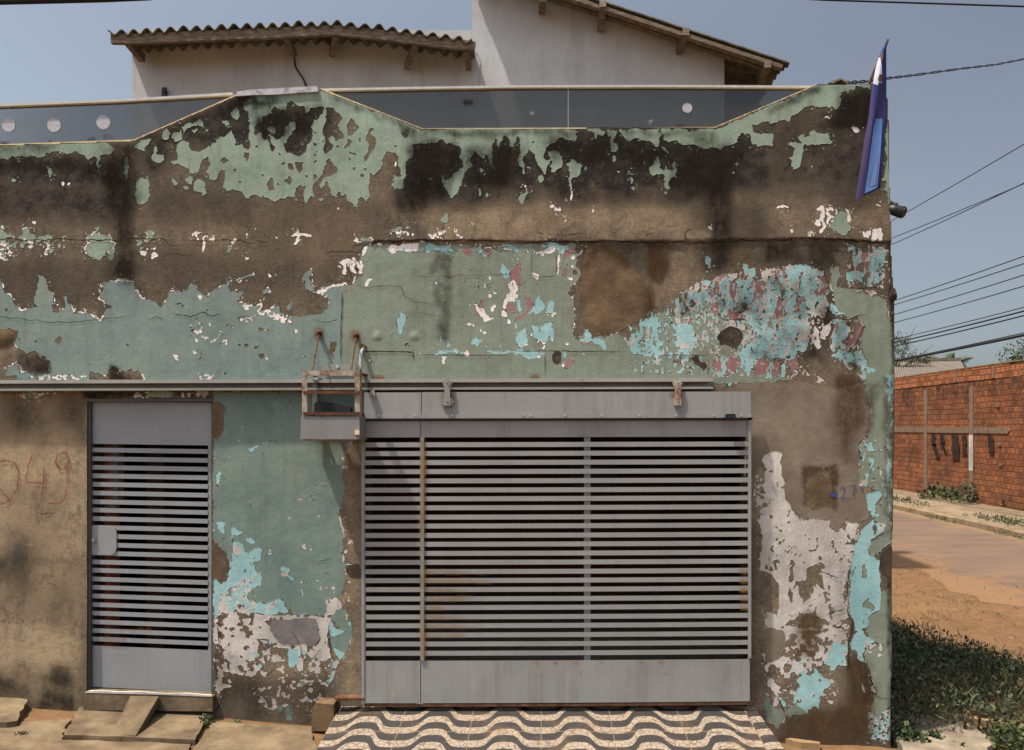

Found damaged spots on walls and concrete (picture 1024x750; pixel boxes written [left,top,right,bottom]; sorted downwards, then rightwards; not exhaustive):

water stain [219,97,307,137]
water stain [397,129,519,209]
water stain [535,129,670,164]
water stain [672,137,736,268]
water stain [828,91,871,127]
peeling [876,123,889,206]
water stain [115,255,134,281]
crack [0,237,268,256]
crack [313,226,884,357]
peeling [0,204,894,744]